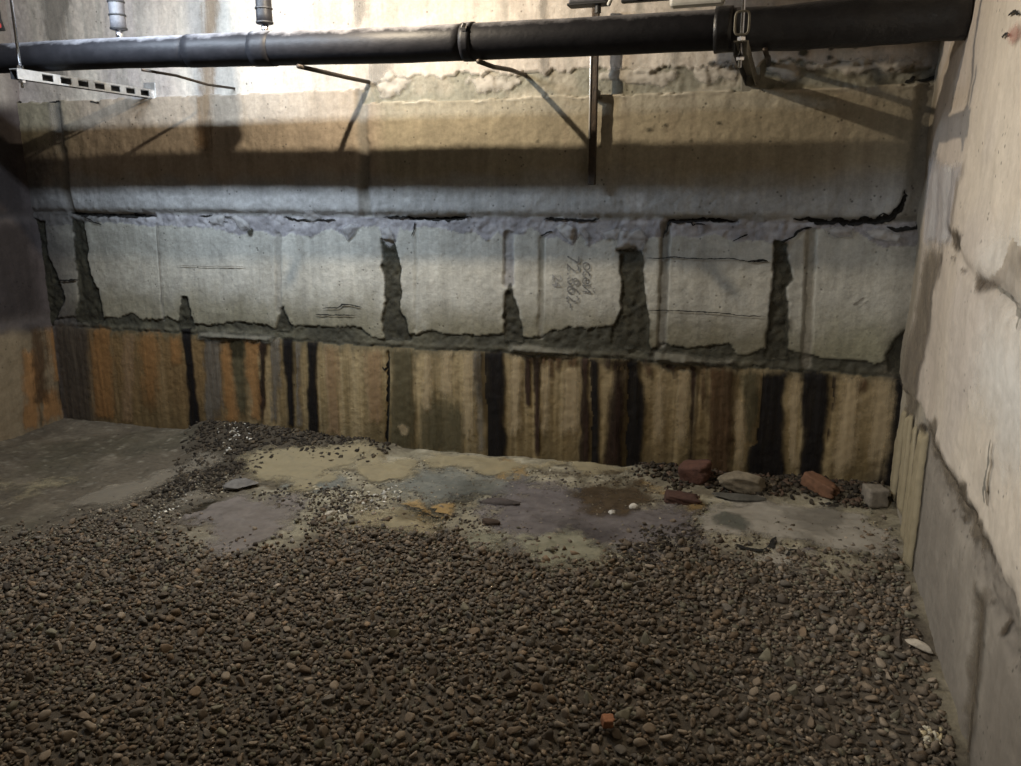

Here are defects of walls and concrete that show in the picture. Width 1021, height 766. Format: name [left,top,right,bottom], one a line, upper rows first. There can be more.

spalling [377,70,411,97]
spalling [466,70,520,93]
crack [782,190,918,242]
spalling [72,219,104,324]
spalling [179,296,195,329]
spalling [381,227,410,340]
spalling [502,284,523,343]
spalling [601,229,651,353]
spalling [764,240,792,360]
corrosion [24,332,61,427]
damp [182,328,247,426]
damp [174,338,749,558]